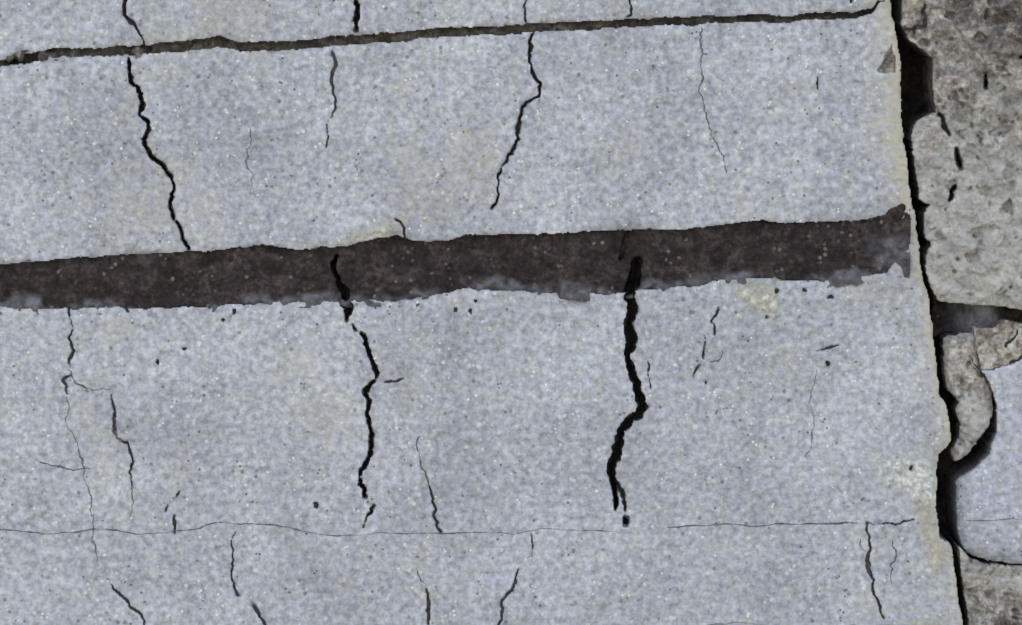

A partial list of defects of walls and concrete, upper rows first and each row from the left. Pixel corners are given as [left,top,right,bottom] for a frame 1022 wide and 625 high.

crack [352,0,360,31]
crack [904,5,927,31]
crack [122,0,189,249]
crack [326,52,338,146]
crack [492,0,542,208]
crack [938,114,962,201]
crack [693,308,723,374]
crack [0,230,651,625]
crack [805,345,838,457]
crack [667,519,914,618]